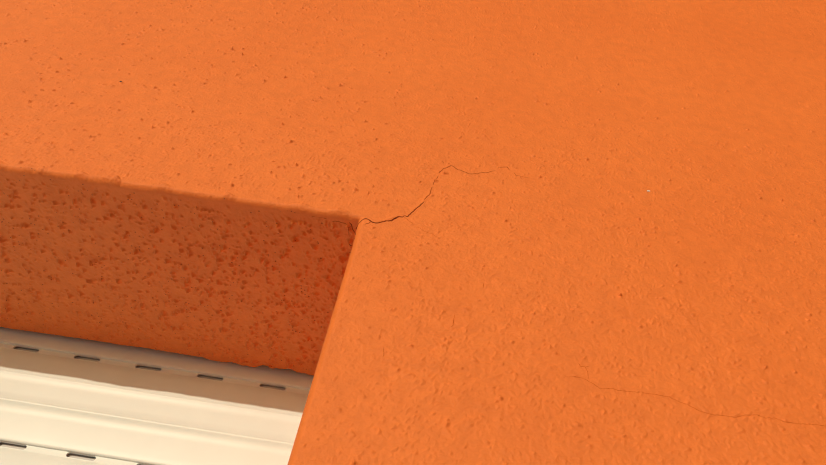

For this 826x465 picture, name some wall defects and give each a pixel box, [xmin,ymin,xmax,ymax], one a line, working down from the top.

crack [320,165,523,246]